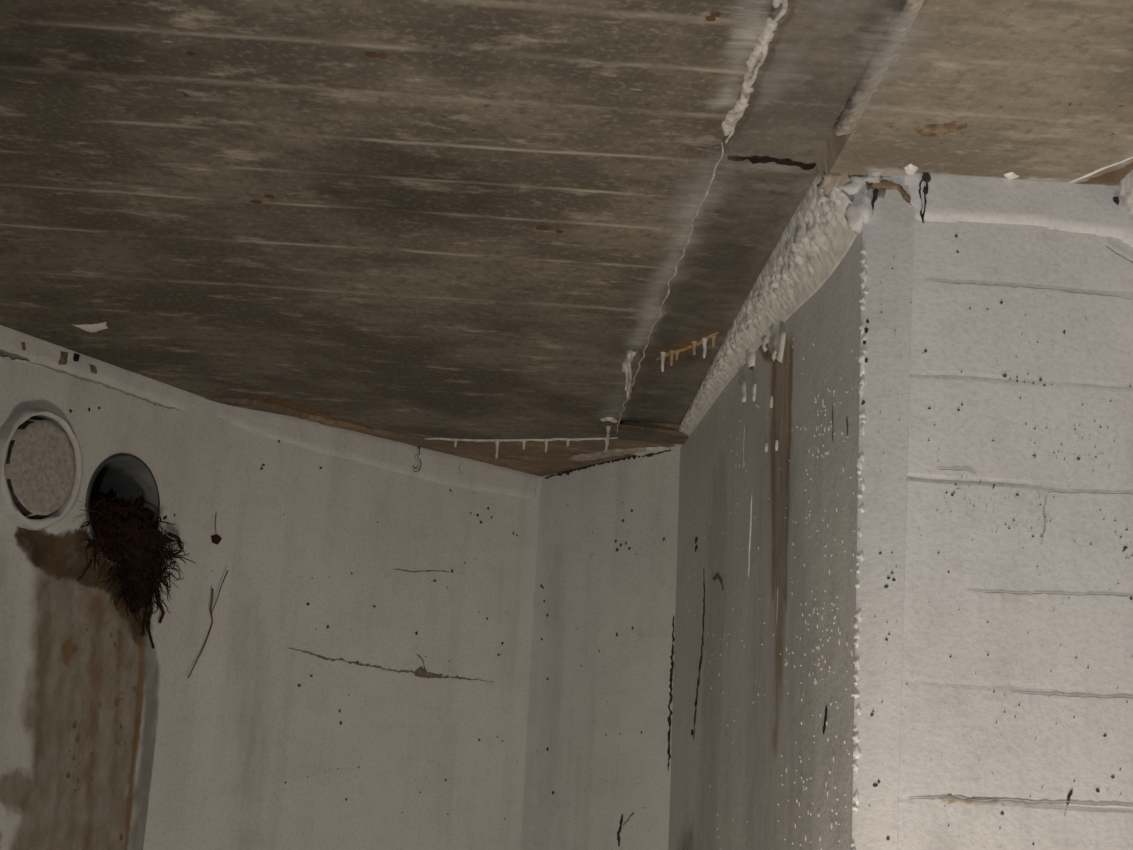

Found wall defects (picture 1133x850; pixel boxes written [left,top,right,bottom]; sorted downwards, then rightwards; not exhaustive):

crack [727,156,816,170]
crack [832,406,848,441]
crack [287,647,489,682]
crack [667,537,723,768]
water stain [135,668,157,837]
crack [909,790,1133,816]